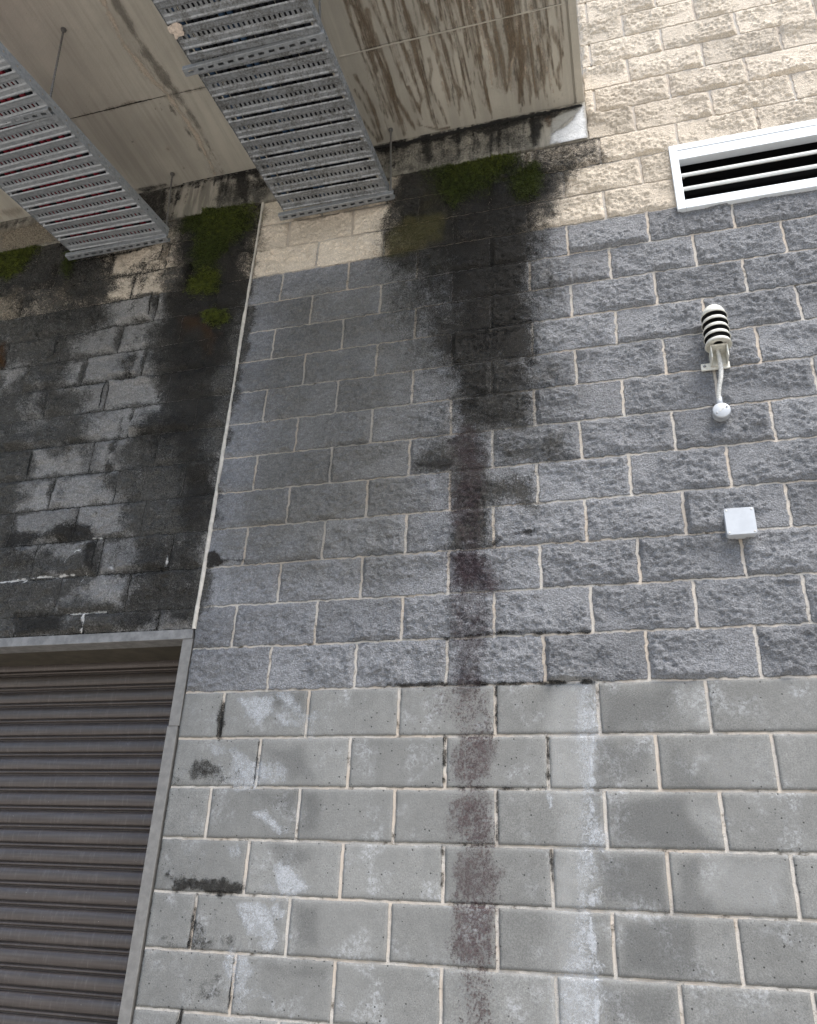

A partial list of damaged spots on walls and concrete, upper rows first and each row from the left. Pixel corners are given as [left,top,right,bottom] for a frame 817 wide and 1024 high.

damp [0,0,269,638]
damp [344,0,607,549]
damp [175,760,222,781]
damp [387,680,566,724]
damp [580,679,596,786]
damp [166,871,283,949]
damp [565,918,600,1024]